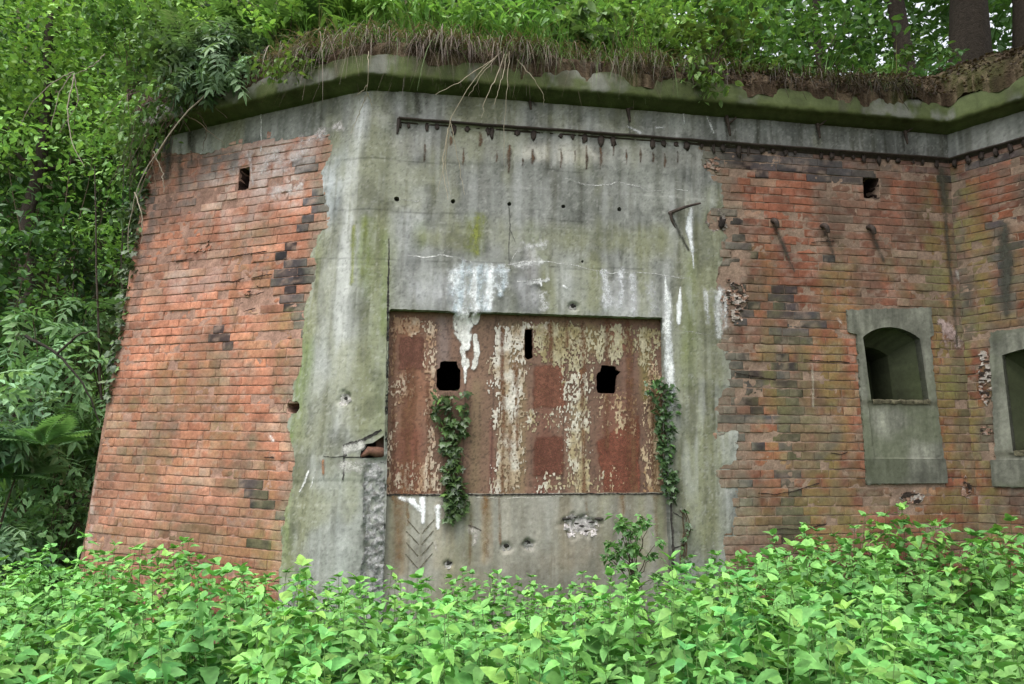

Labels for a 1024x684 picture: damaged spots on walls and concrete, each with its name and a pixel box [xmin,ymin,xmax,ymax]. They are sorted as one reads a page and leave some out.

efflorescence [450,260,543,383]
rust [500,328,518,492]
rust [533,321,566,409]
rust [582,320,654,499]
efflorescence [663,277,682,409]
efflorescence [704,290,727,338]
spalling [720,278,749,324]
spalling [978,351,992,406]
leakage [998,223,1013,314]
peeling [360,315,443,630]
rust [534,436,565,476]
spalling [562,514,603,538]